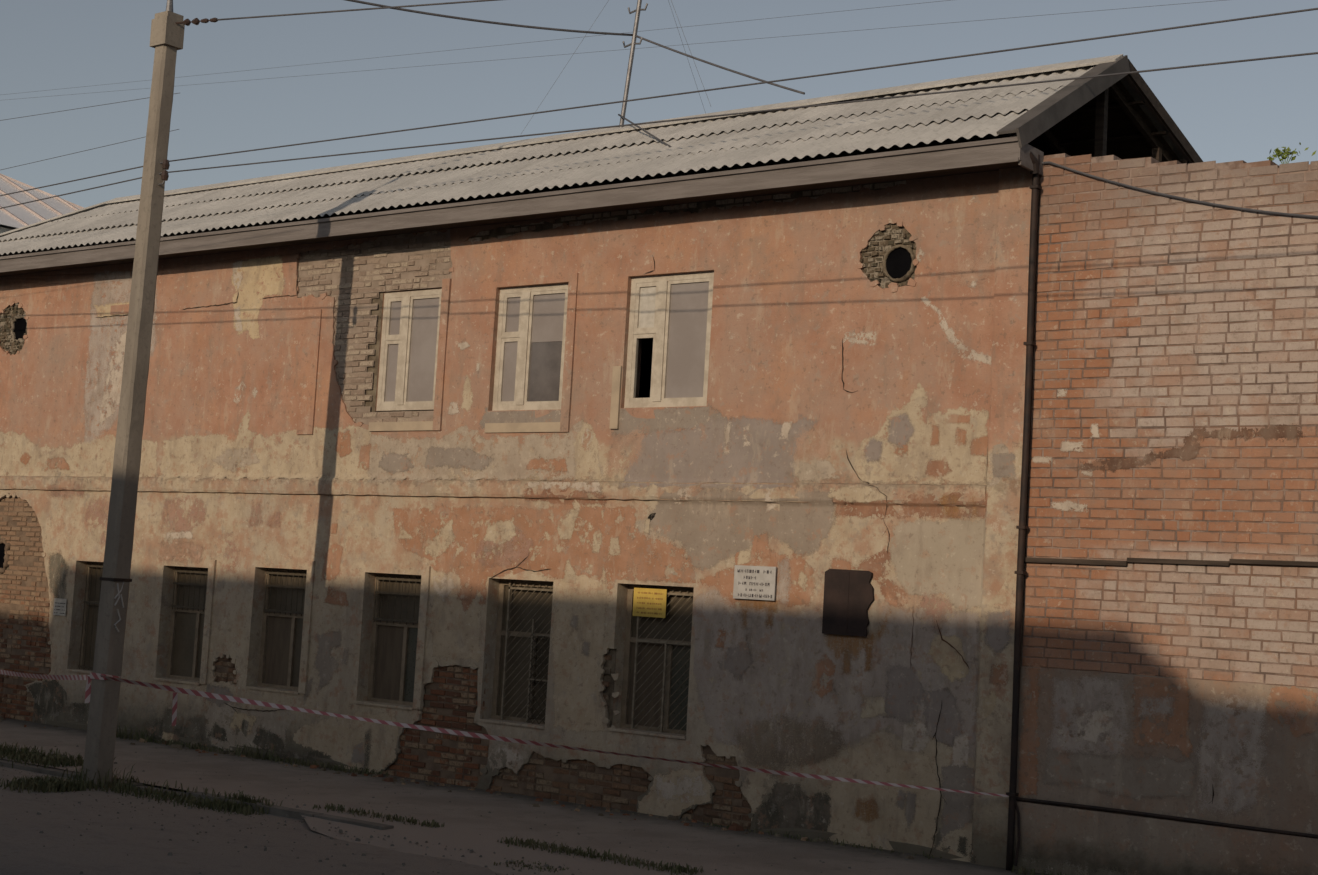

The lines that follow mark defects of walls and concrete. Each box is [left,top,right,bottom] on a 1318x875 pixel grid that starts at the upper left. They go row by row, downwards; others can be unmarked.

flaking render [857,221,992,365]
peeling [0,271,133,544]
peeling [139,180,958,732]
crack [846,451,890,554]
peeling [1050,499,1089,512]
flaking render [0,492,52,721]
flaking render [204,629,774,830]
flaking render [826,737,978,864]
crack [929,704,947,856]
crack [910,615,969,668]
peeling [980,577,1043,797]